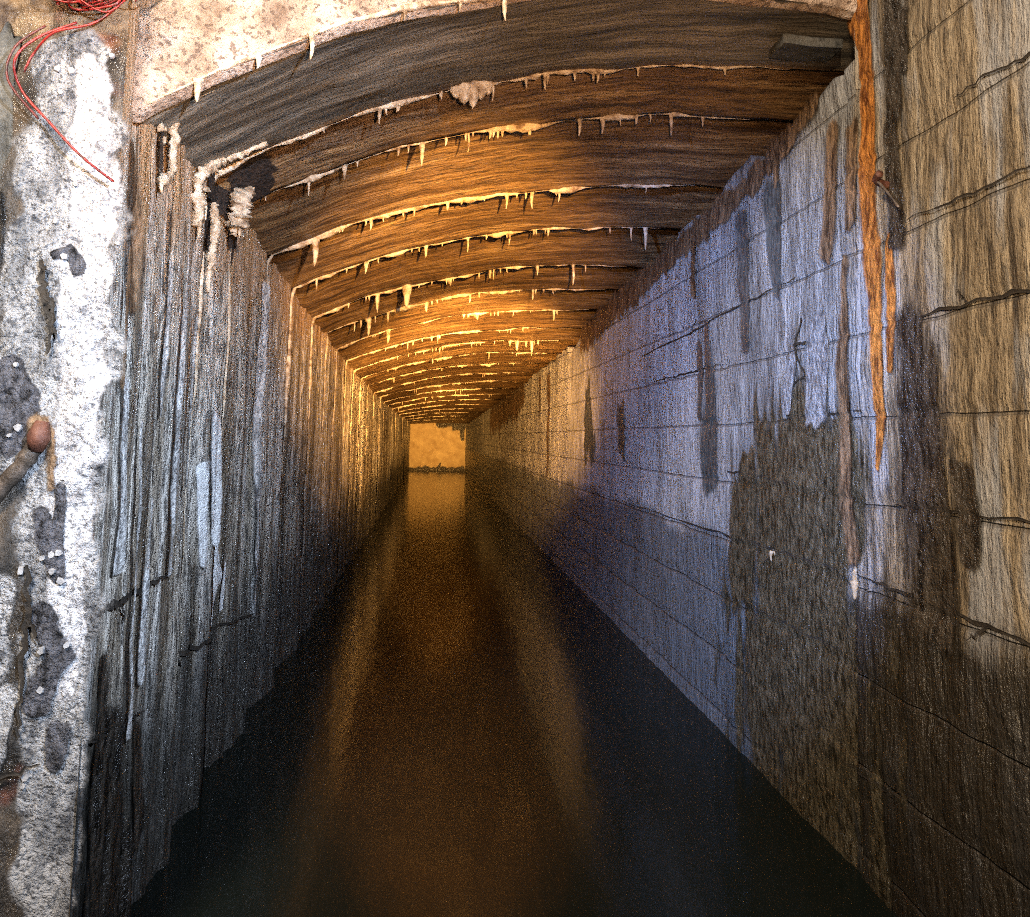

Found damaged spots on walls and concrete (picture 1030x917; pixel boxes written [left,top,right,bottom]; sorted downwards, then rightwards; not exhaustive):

leakage [84,132,154,917]
efflorescence [149,0,508,105]
leakage [160,64,817,626]
leakage [819,117,865,601]
corrosion [847,0,896,470]
crack [896,289,1030,322]
crack [907,165,1030,220]
crack [954,51,1030,98]